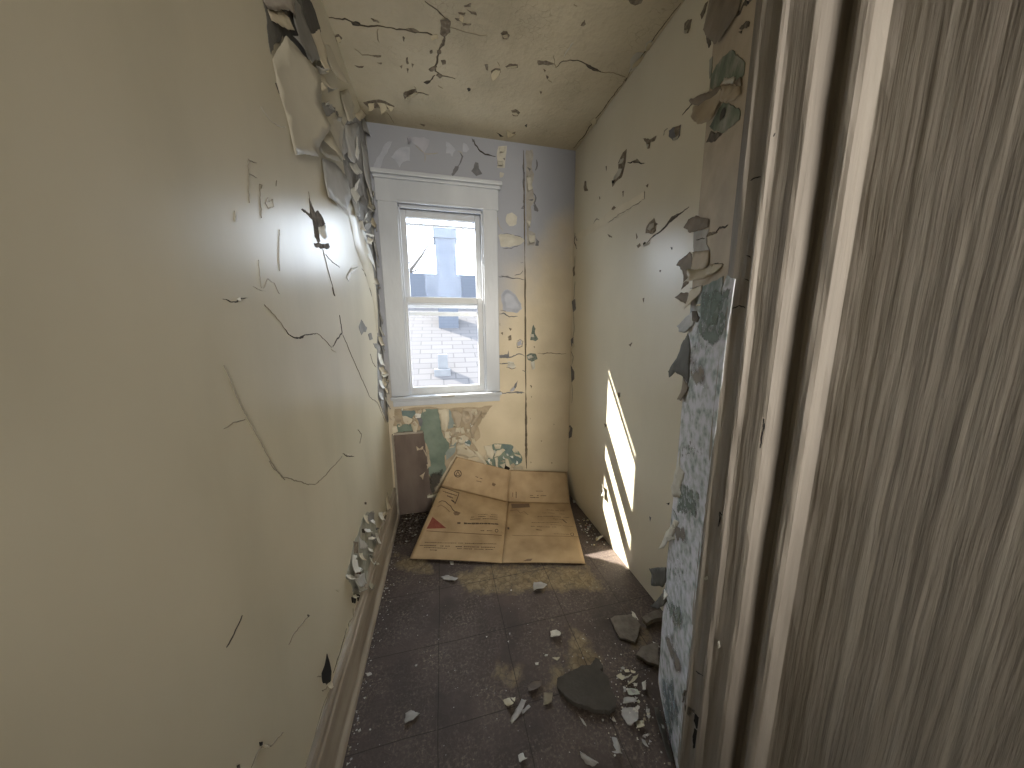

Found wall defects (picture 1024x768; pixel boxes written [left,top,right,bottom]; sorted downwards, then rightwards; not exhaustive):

crack [329,1,455,89]
peeling [643,0,752,149]
crack [225,158,386,422]
peeling [263,0,532,479]
peeling [497,149,539,246]
peeling [499,325,538,398]
crack [501,150,566,469]
peeling [606,149,627,195]
crack [637,207,689,248]
crack [223,365,362,485]
peeling [346,493,392,603]
spalling [317,654,334,692]